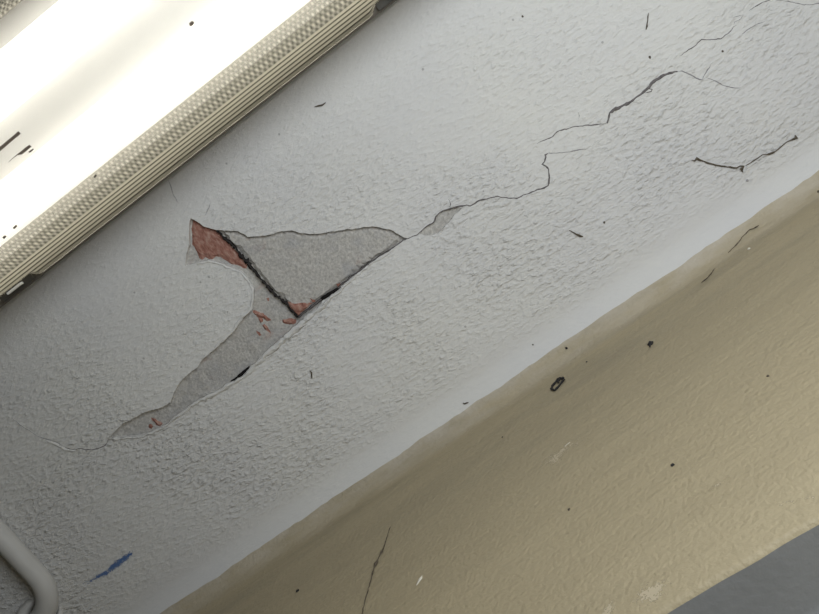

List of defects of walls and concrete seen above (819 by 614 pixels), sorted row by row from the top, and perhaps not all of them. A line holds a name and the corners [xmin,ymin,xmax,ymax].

crack [405,0,819,240]
spalling [111,219,408,440]